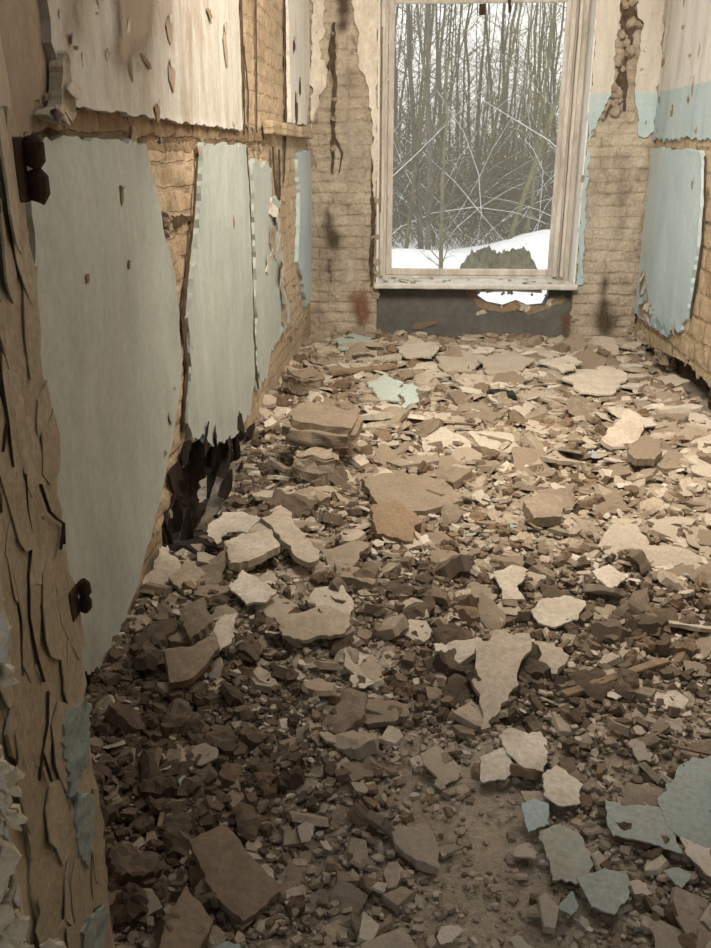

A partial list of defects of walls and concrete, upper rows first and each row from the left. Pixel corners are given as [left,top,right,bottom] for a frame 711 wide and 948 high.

crack [319,22,343,174]
crack [602,0,644,121]
flaking render [570,50,711,396]
peeling [476,289,554,312]
peeling [0,0,383,948]